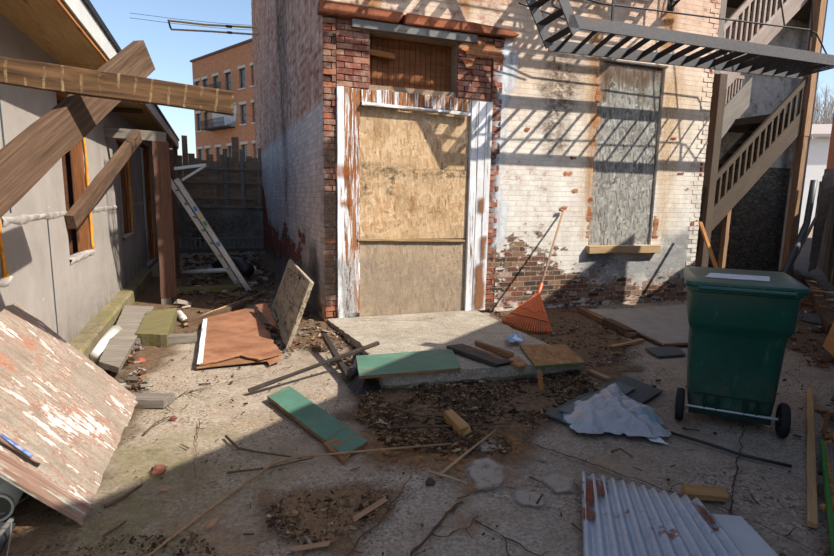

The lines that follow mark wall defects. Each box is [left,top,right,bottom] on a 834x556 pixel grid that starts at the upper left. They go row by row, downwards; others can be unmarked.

water stain [542,60,578,134]
peeling [262,185,305,268]
peeling [474,223,687,311]